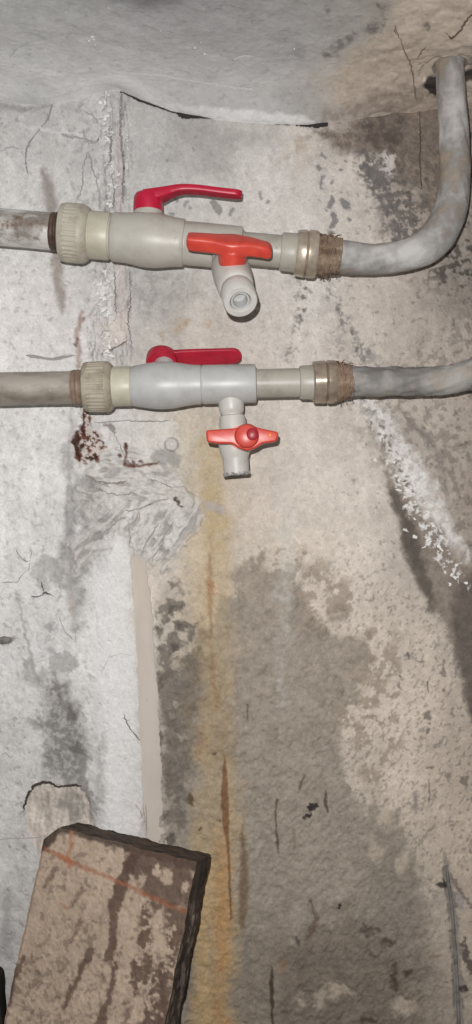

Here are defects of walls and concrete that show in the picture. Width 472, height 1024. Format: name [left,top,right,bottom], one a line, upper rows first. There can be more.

peeling [97,90,130,208]
crack [1,71,256,209]
crack [276,121,328,129]
leakage [165,0,472,242]
crack [394,14,472,189]
peeling [80,268,132,358]
crack [113,271,132,347]
corrosion [70,406,160,470]
corrosion [184,422,250,1024]
leakage [231,396,472,1024]